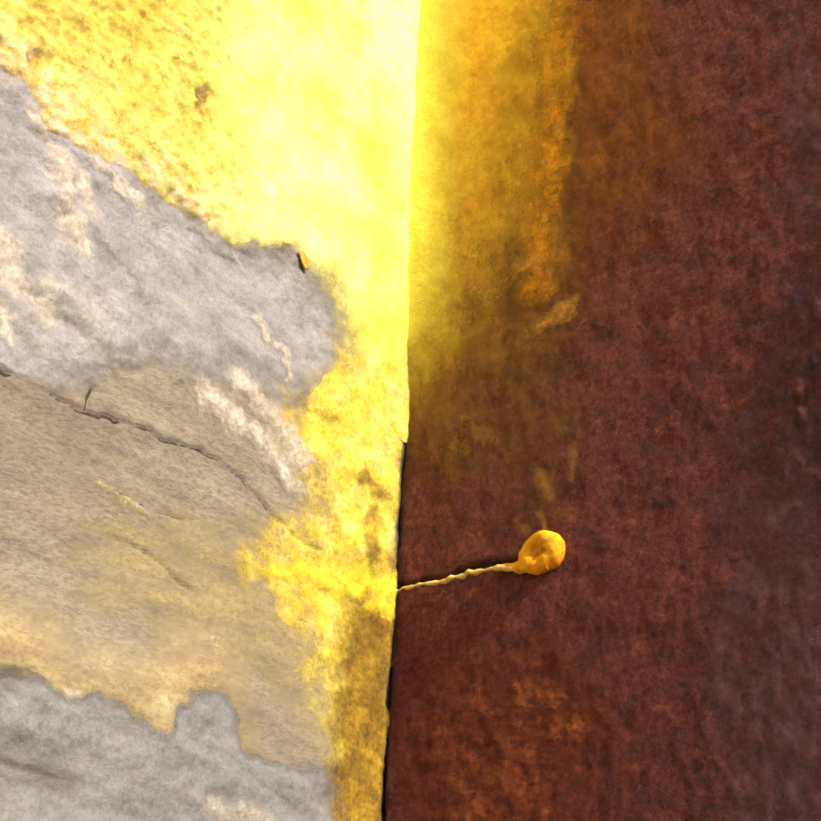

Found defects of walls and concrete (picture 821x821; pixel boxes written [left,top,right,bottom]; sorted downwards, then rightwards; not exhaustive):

spalling [0,68,343,488]
corrosion [537,296,576,330]
crack [32,388,280,523]
crack [378,439,522,821]
peeling [0,666,349,821]